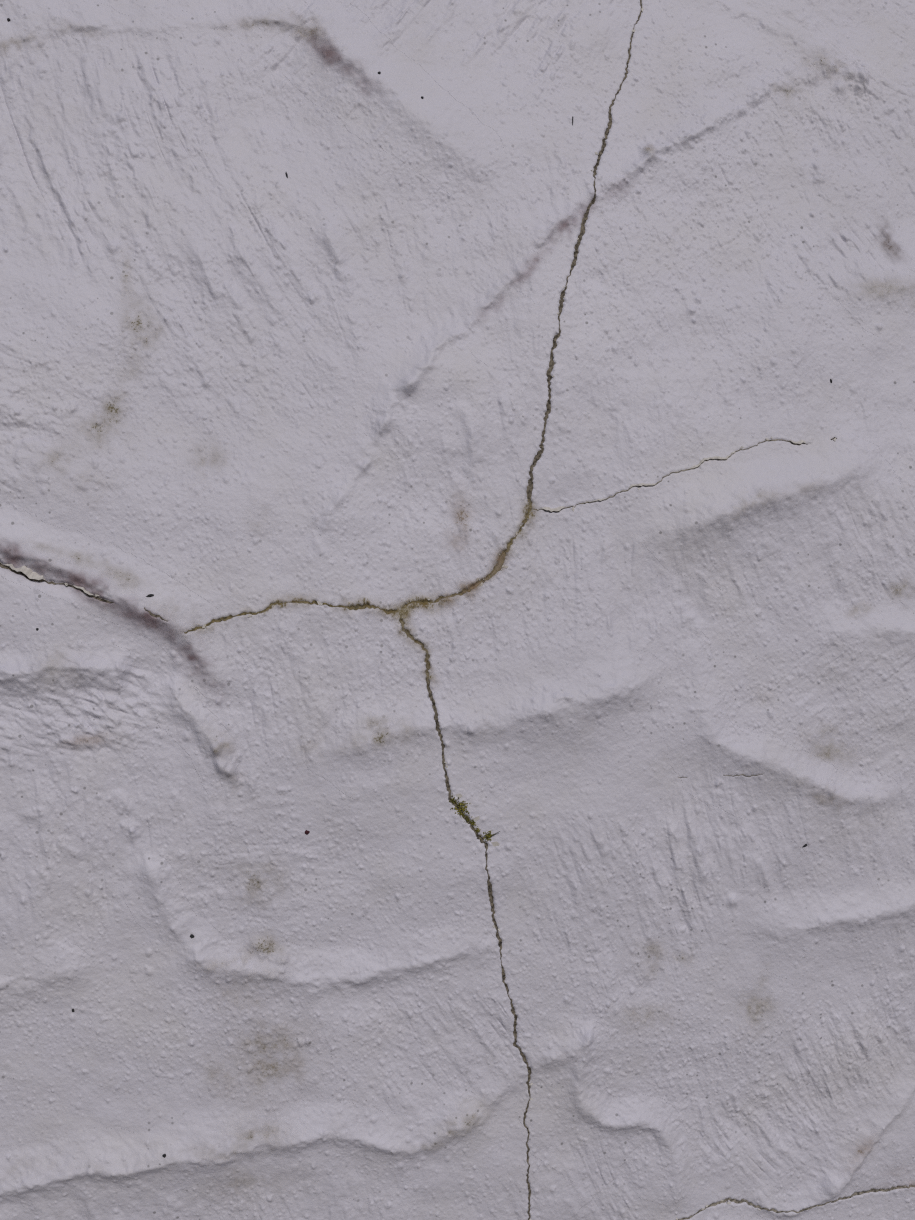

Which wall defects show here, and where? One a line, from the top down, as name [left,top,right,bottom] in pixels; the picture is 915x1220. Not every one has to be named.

crack [0,562,113,603]
crack [144,0,809,1220]
crack [676,1185,915,1220]